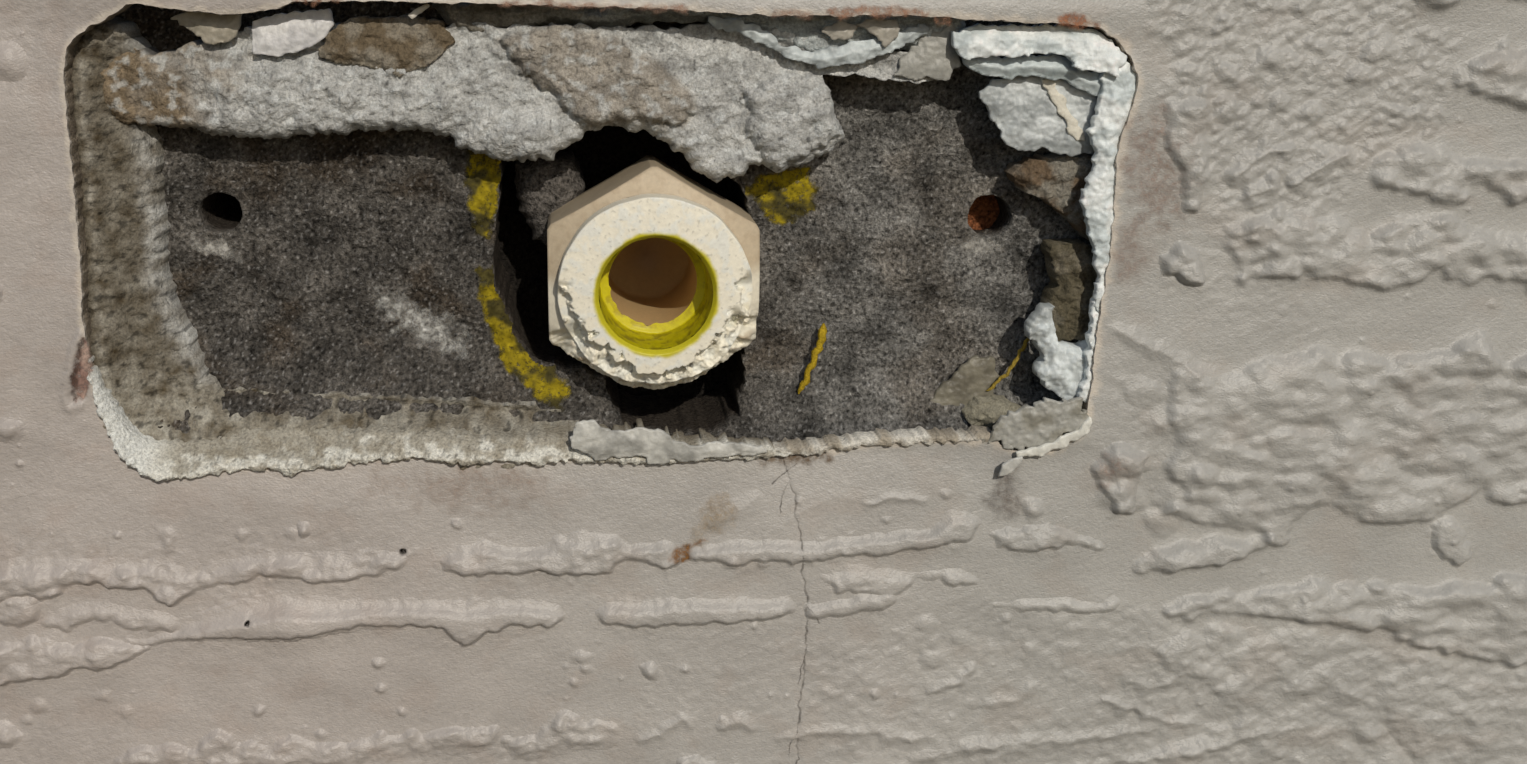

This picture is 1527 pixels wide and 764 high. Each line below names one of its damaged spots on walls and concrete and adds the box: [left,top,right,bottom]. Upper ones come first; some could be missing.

spalling [70,3,1137,481]
corrosion [672,540,702,563]